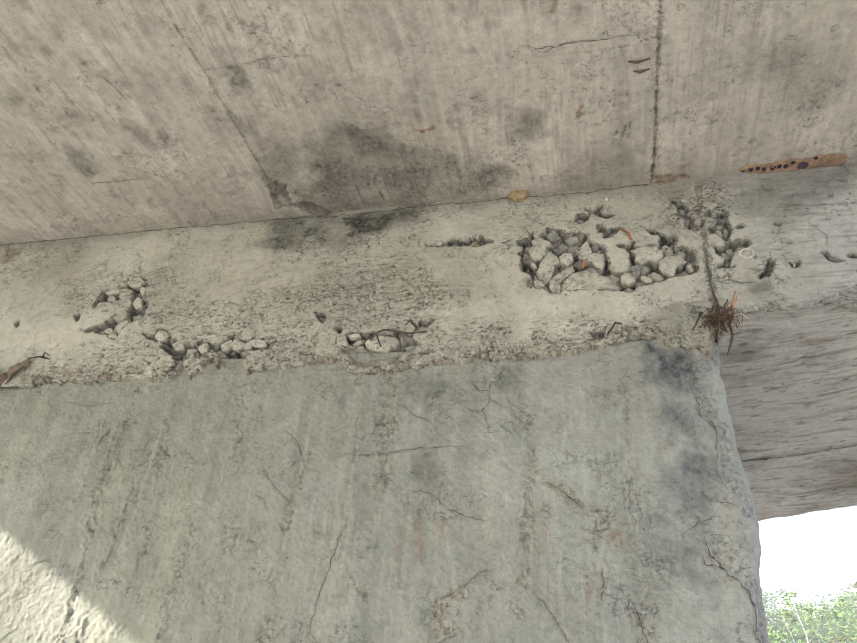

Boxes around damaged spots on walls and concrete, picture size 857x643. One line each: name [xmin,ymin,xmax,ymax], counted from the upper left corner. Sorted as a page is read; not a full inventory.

crack [526,33,648,51]
spalling [424,233,494,248]
spalling [515,200,753,295]
spalling [819,250,857,264]
spalling [73,276,149,340]
spalling [141,327,278,375]
spalling [313,312,435,368]
crack [468,369,504,424]
crack [338,445,464,457]
crack [413,490,488,521]
crack [683,384,760,641]